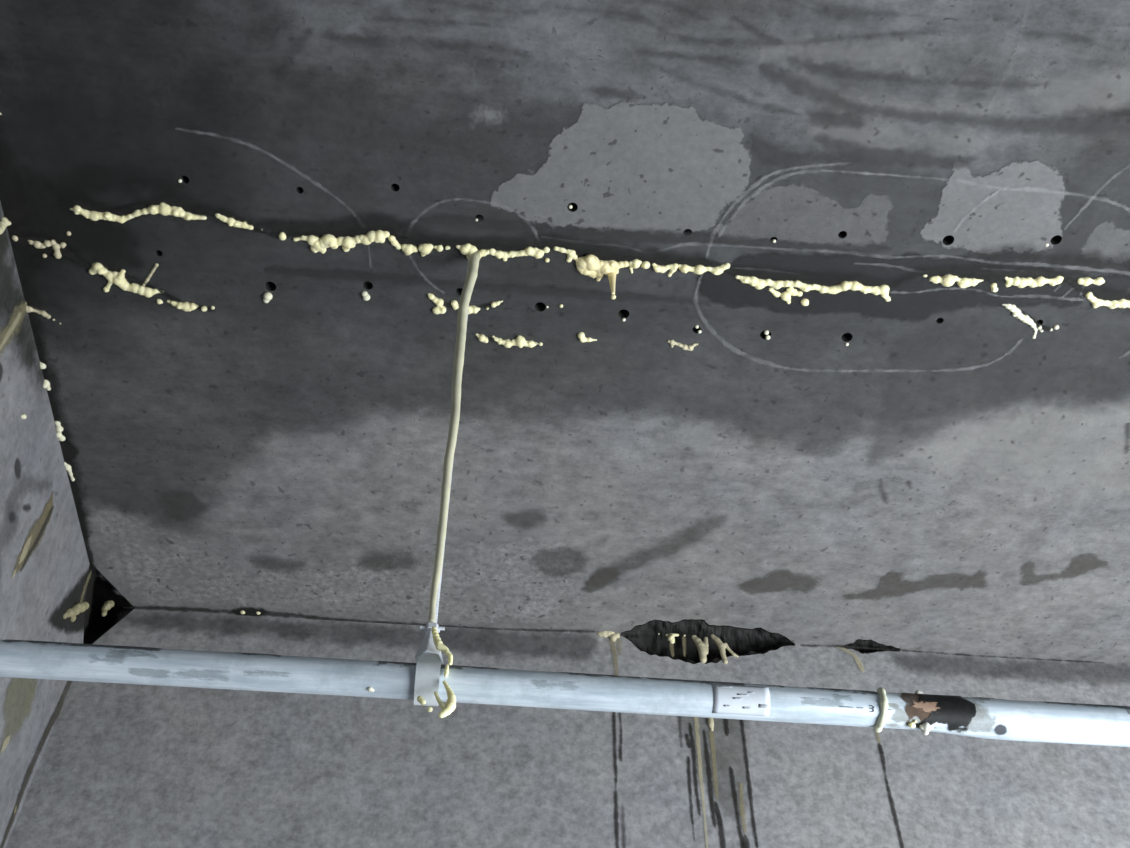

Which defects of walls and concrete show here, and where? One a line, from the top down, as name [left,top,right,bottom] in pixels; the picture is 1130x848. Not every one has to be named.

crack [0,137,215,580]
water stain [239,260,496,383]
crack [60,198,1130,331]
water stain [446,99,1130,405]
water stain [585,556,645,592]
spalling [620,619,795,664]
water stain [741,571,816,594]
water stain [844,572,985,599]
water stain [1022,554,1107,585]
water stain [613,712,626,848]
water stain [679,716,758,848]